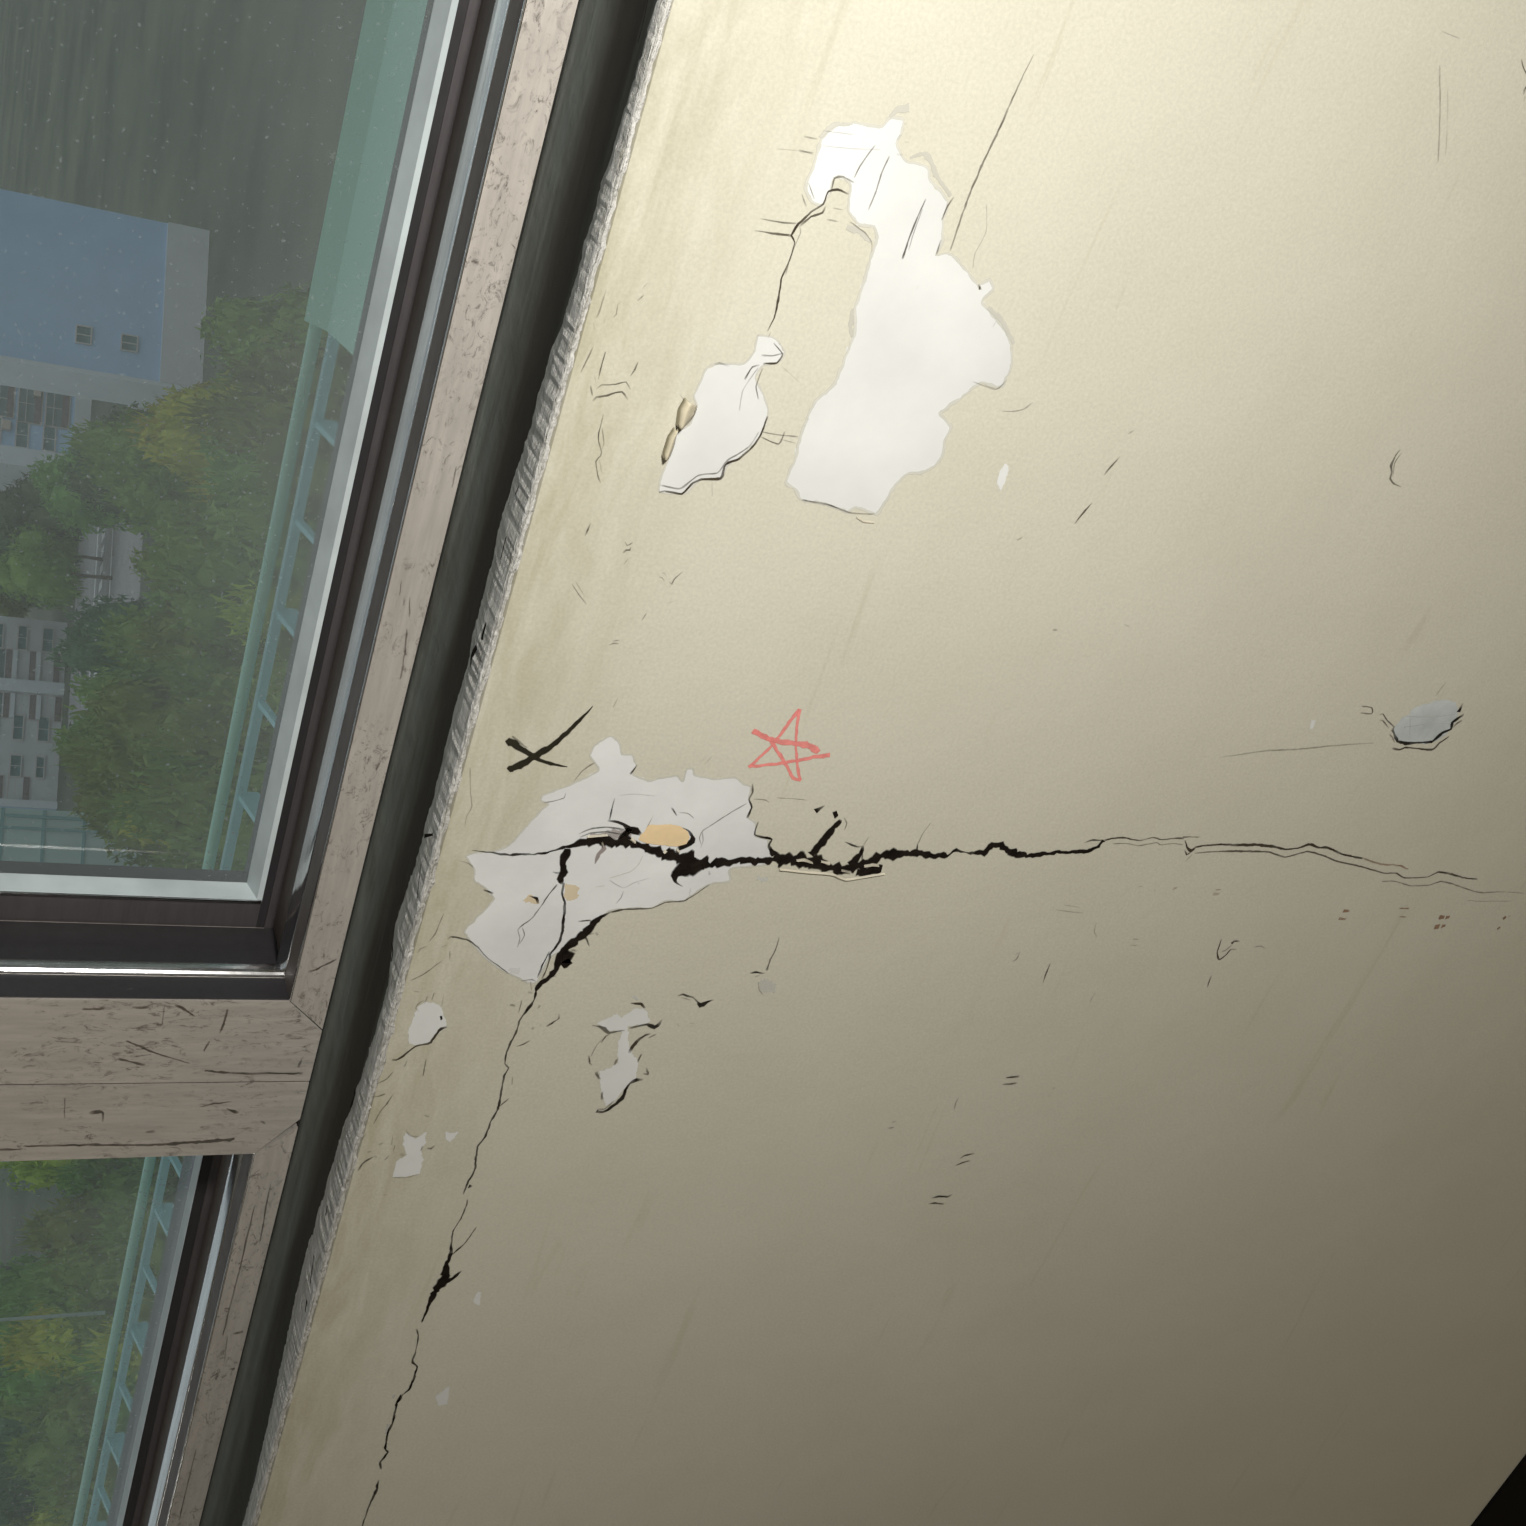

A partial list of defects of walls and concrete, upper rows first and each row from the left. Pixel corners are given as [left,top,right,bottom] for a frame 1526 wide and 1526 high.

peeling [658,103,1015,524]
spalling [242,0,673,1526]
spalling [452,736,773,990]
peeling [1368,700,1462,751]
crack [362,788,1476,1526]